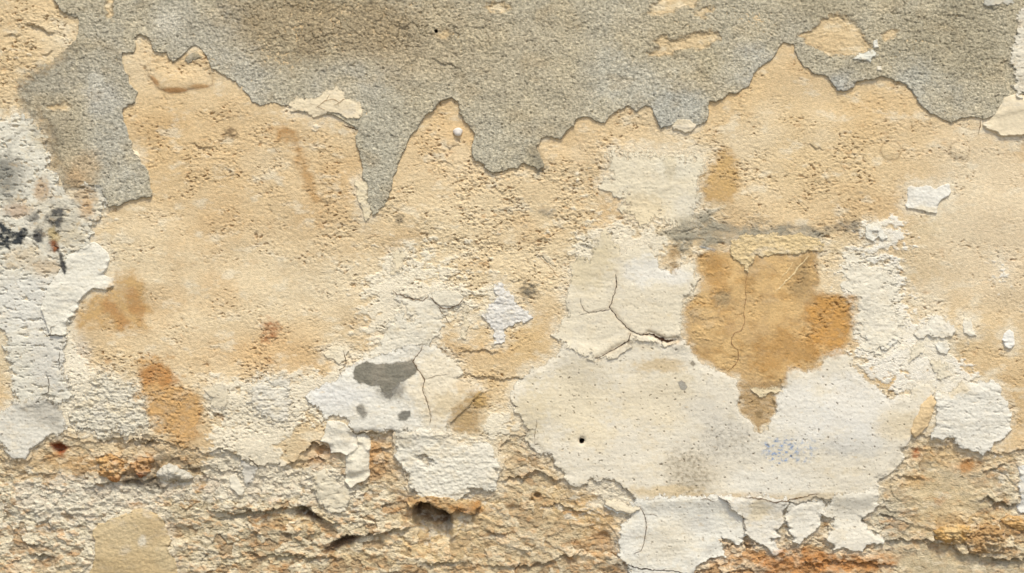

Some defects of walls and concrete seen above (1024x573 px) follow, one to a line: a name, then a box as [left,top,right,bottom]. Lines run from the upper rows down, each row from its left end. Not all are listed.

peeling [17,0,1024,231]
crack [413,345,446,421]
crack [580,274,673,357]
peeling [394,228,1024,573]